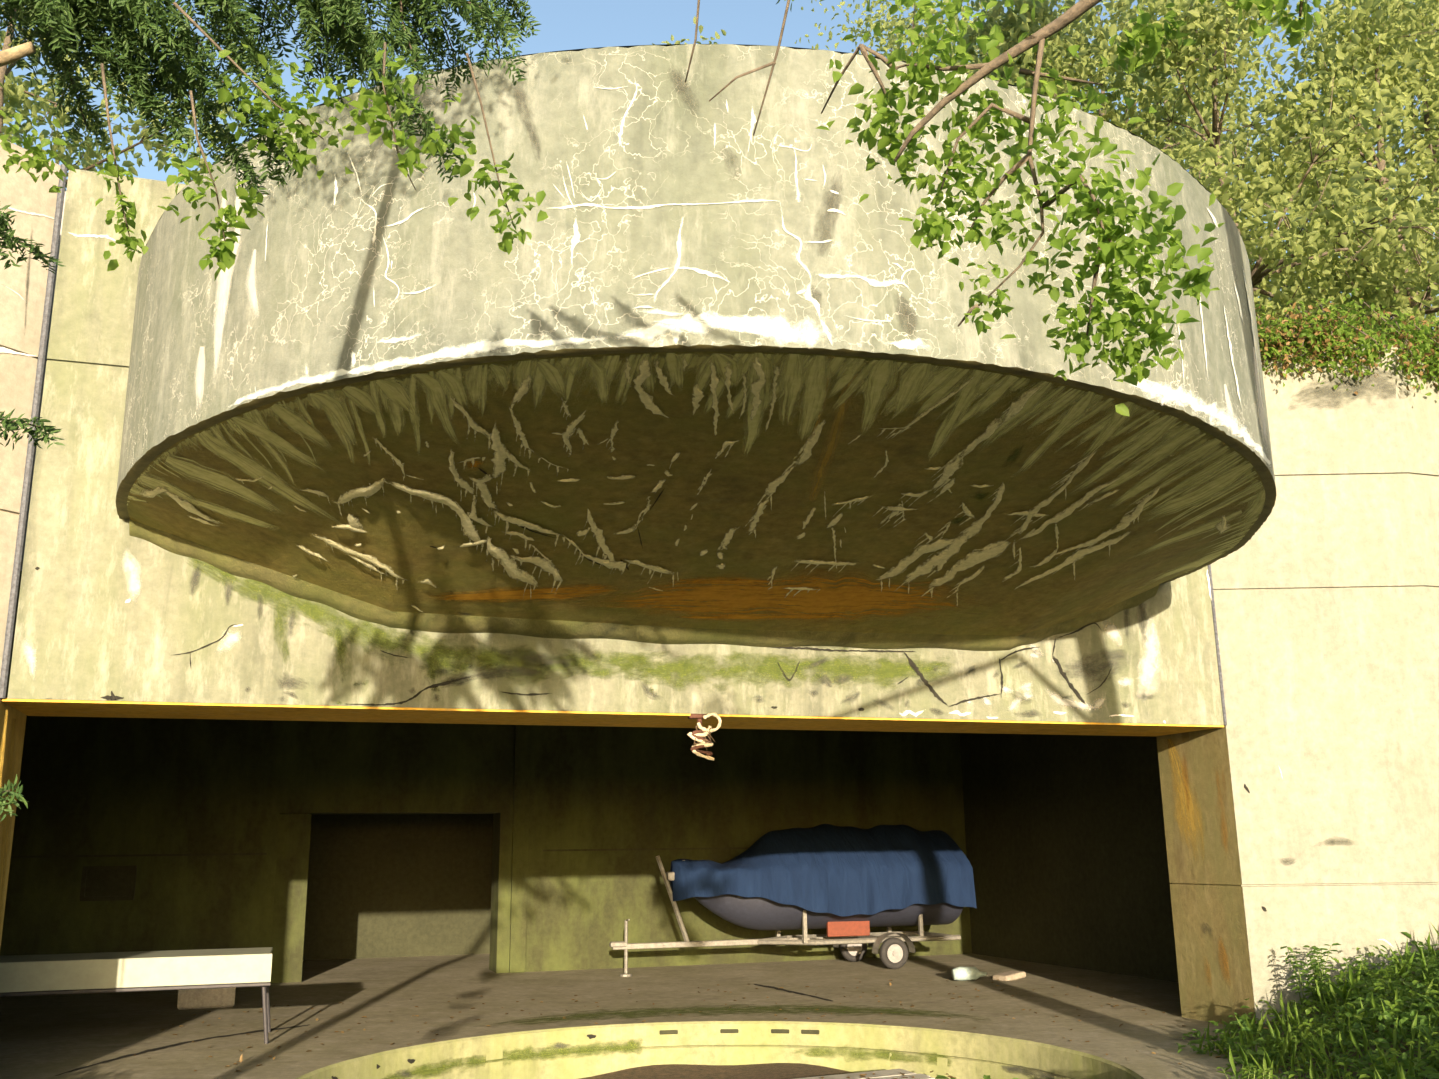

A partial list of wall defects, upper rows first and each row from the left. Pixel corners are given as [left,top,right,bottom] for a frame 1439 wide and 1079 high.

crack [349,156,435,306]
crack [553,85,913,344]
damp [822,184,839,239]
damp [127,270,1271,606]
rust [441,571,959,620]
damp [1125,603,1147,637]
crack [175,624,237,667]
damp [336,634,346,673]
crack [772,623,1111,707]
damp [1074,651,1124,676]
crack [350,677,469,706]
crack [503,690,551,698]